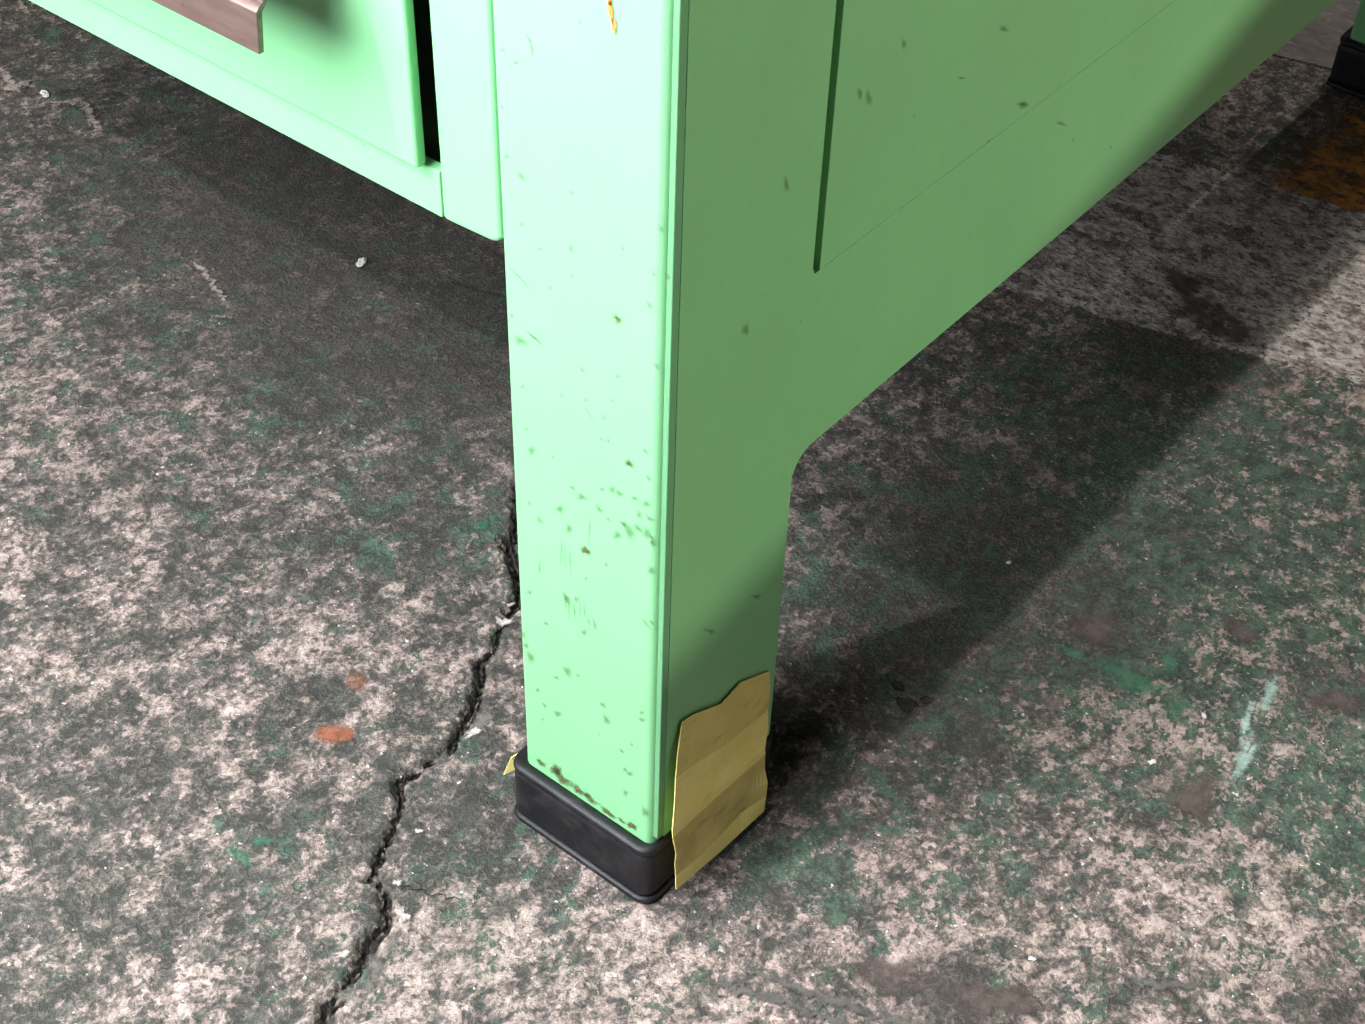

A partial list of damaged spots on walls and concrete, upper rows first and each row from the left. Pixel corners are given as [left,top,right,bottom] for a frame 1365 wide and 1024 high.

corrosion [316,726,353,741]
crack [319,505,520,1024]